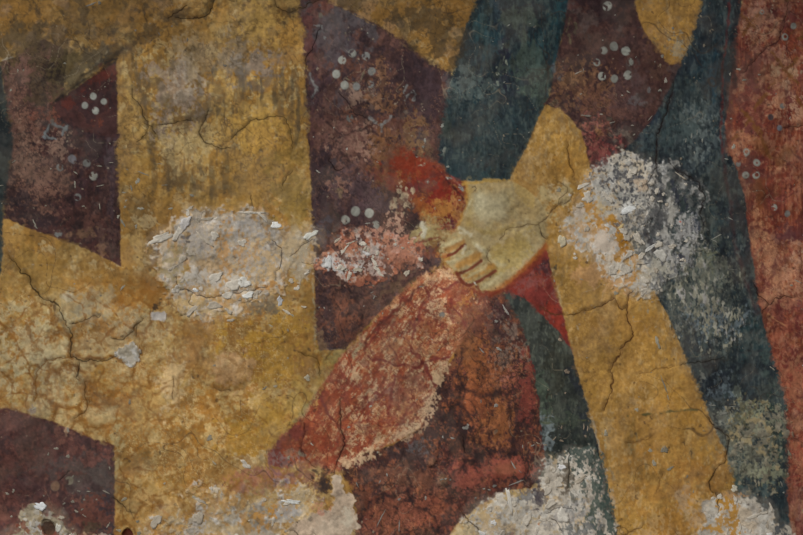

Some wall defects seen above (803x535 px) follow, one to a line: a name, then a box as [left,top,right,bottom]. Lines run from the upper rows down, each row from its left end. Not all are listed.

crack [168,0,235,20]
crack [274,0,319,13]
crack [131,88,293,149]
flaking render [132,194,427,336]
flaking render [555,145,748,362]
crack [9,255,144,419]
crack [542,290,634,410]
crack [639,356,726,374]
flaking render [0,460,362,535]
flaking render [457,425,624,535]
flaking render [689,396,797,535]